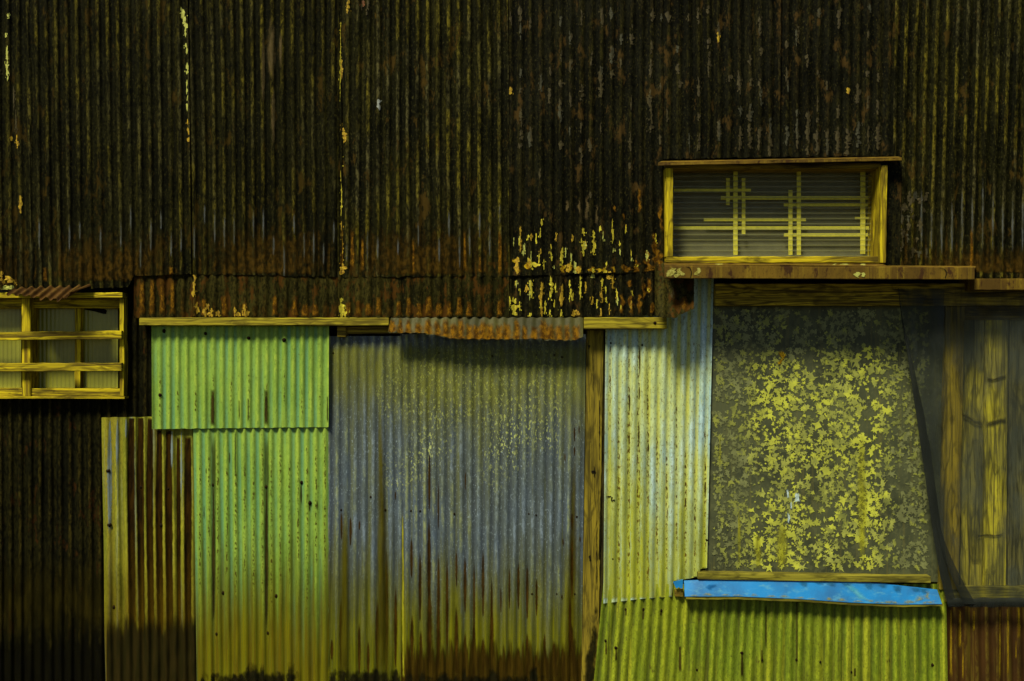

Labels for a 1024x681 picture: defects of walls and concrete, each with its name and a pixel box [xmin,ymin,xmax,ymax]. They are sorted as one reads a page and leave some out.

corrosion [0,232,579,340]
peeling [509,219,657,317]
corrosion [561,207,664,313]
corrosion [127,380,326,631]
corrosion [358,456,581,681]
corrosion [950,611,975,676]
corrosion [999,608,1020,673]